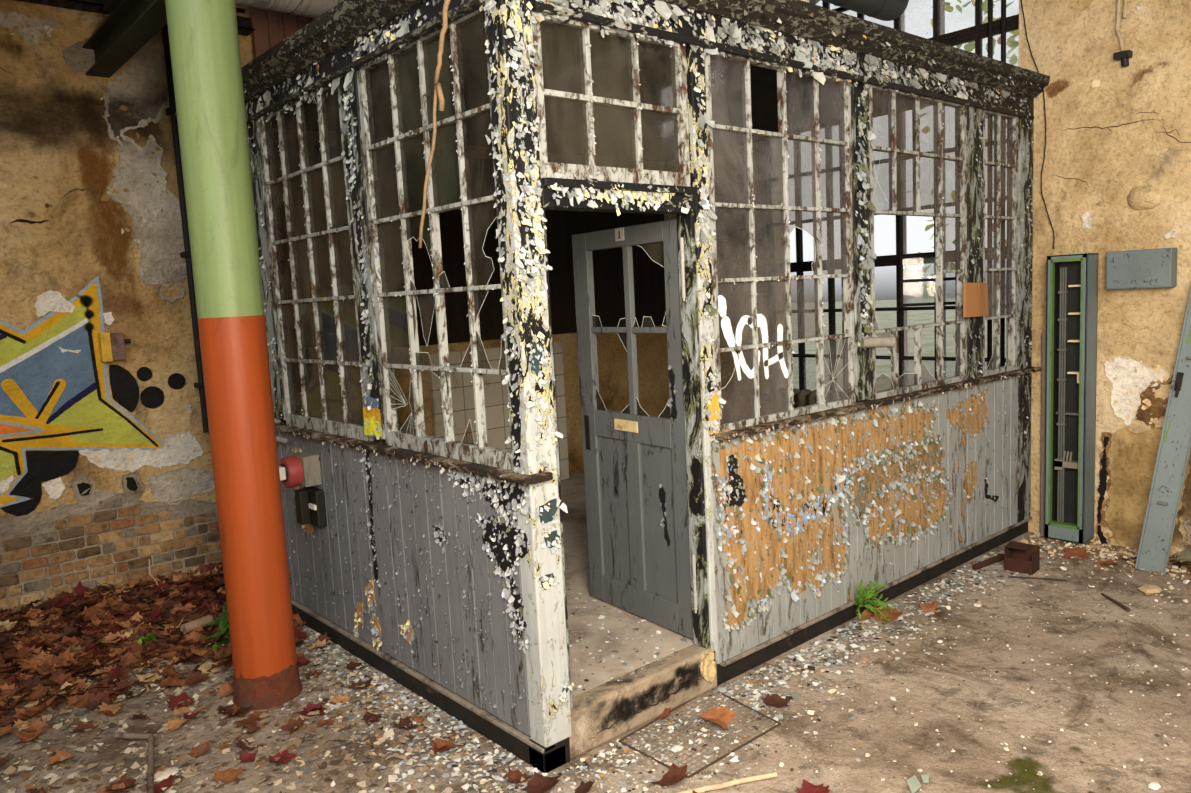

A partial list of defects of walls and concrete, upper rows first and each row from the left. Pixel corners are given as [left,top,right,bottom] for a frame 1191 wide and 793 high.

crack [11,188,103,224]
leakage [79,134,132,281]
flaking render [92,37,187,287]
flaking render [34,290,75,316]
flaking render [103,312,114,325]
peeling [244,0,1040,727]
flaking render [1104,356,1174,429]
flaking render [0,431,222,613]
spalling [1094,432,1122,547]
peeling [284,540,1065,793]